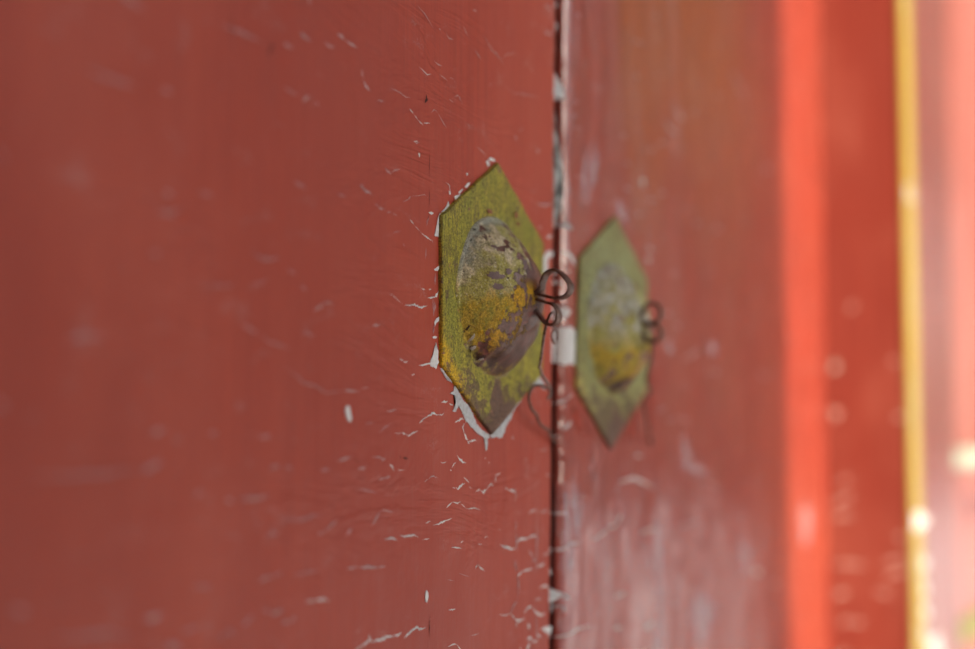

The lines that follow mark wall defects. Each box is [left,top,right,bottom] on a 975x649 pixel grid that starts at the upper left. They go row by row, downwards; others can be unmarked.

peeling [546,73,573,239]
peeling [428,173,470,237]
peeling [543,251,576,284]
peeling [418,317,522,451]
peeling [549,570,570,612]